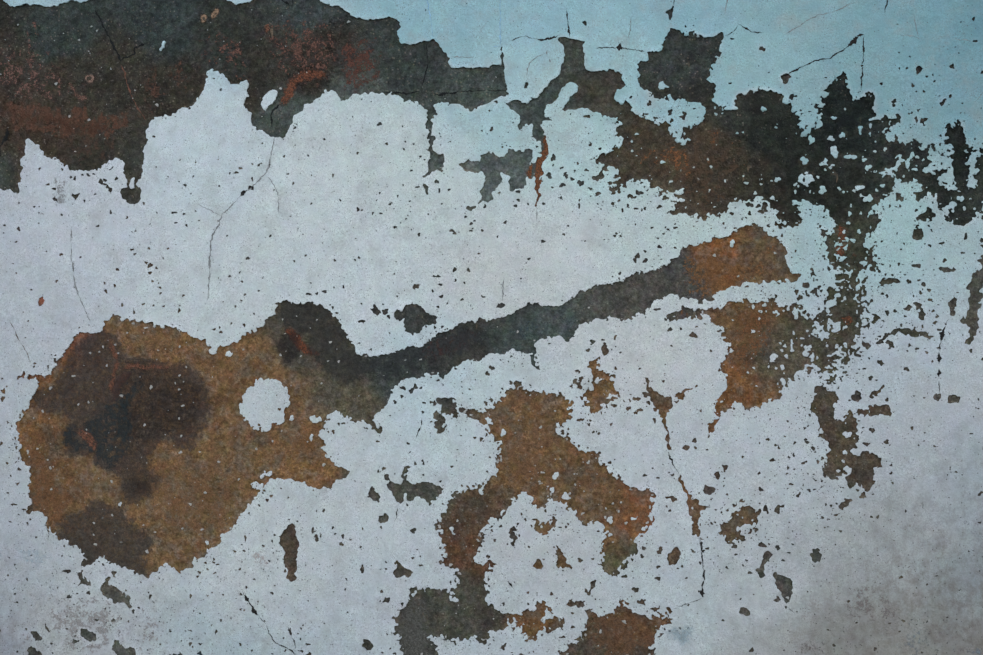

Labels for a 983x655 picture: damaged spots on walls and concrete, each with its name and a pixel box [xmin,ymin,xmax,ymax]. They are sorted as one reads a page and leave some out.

corrosion [0,22,94,114]
corrosion [265,15,385,106]
crack [782,34,865,87]
corrosion [526,137,549,207]
crack [675,538,705,609]
peeling [803,539,836,567]
peeling [112,640,161,655]